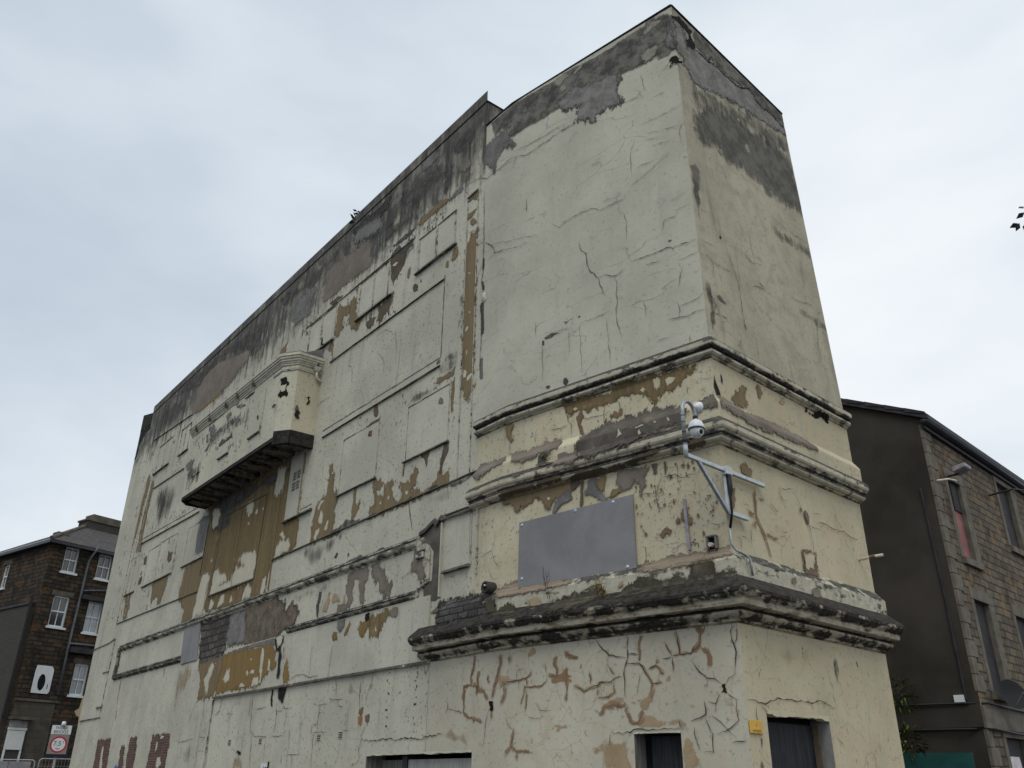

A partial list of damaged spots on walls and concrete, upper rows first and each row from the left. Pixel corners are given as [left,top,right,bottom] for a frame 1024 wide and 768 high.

leakage [134,324,263,460]
peeling [107,390,350,703]
peeling [292,186,485,419]
peeling [351,433,450,520]
crack [463,64,681,378]
leakage [491,14,673,136]
spalling [431,361,822,628]
crack [535,197,770,379]
leakage [691,164,700,207]
leakage [693,31,802,213]
flaking render [93,733,170,768]
crack [182,624,843,766]